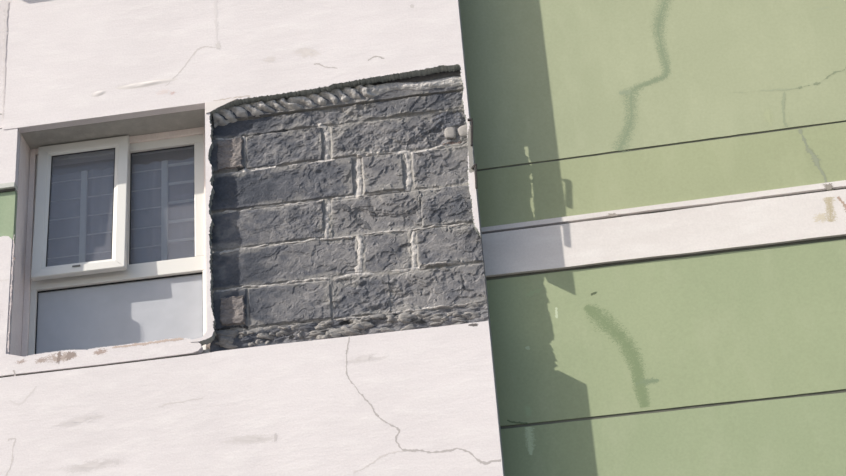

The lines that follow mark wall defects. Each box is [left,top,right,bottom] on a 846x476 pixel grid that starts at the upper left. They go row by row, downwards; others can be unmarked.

water stain [612,0,672,153]
crack [798,129,846,212]
rust [814,197,838,224]
crack [346,337,501,473]
water stain [584,304,659,408]